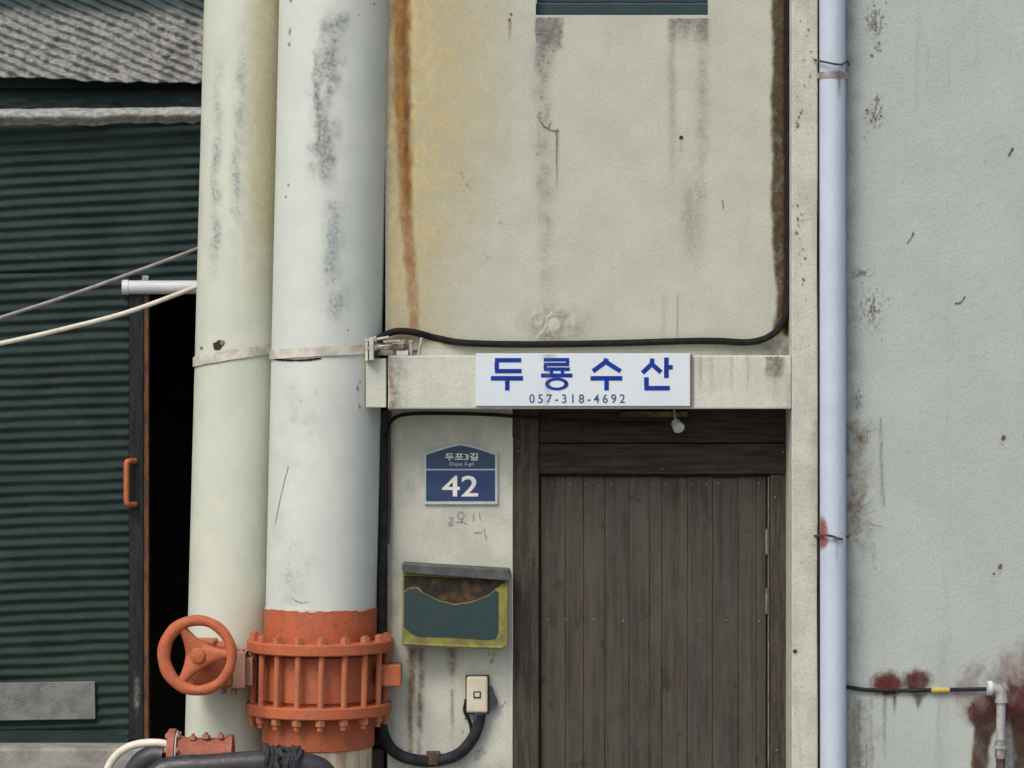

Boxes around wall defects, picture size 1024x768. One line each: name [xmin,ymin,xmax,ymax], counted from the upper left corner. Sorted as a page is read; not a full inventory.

damp [535,17,562,81]
corrosion [386,0,464,348]
crack [537,115,559,183]
damp [766,0,789,374]
corrosion [820,519,836,548]
corrosion [408,650,423,738]
corrosion [875,672,928,703]
corrosion [968,672,1024,768]